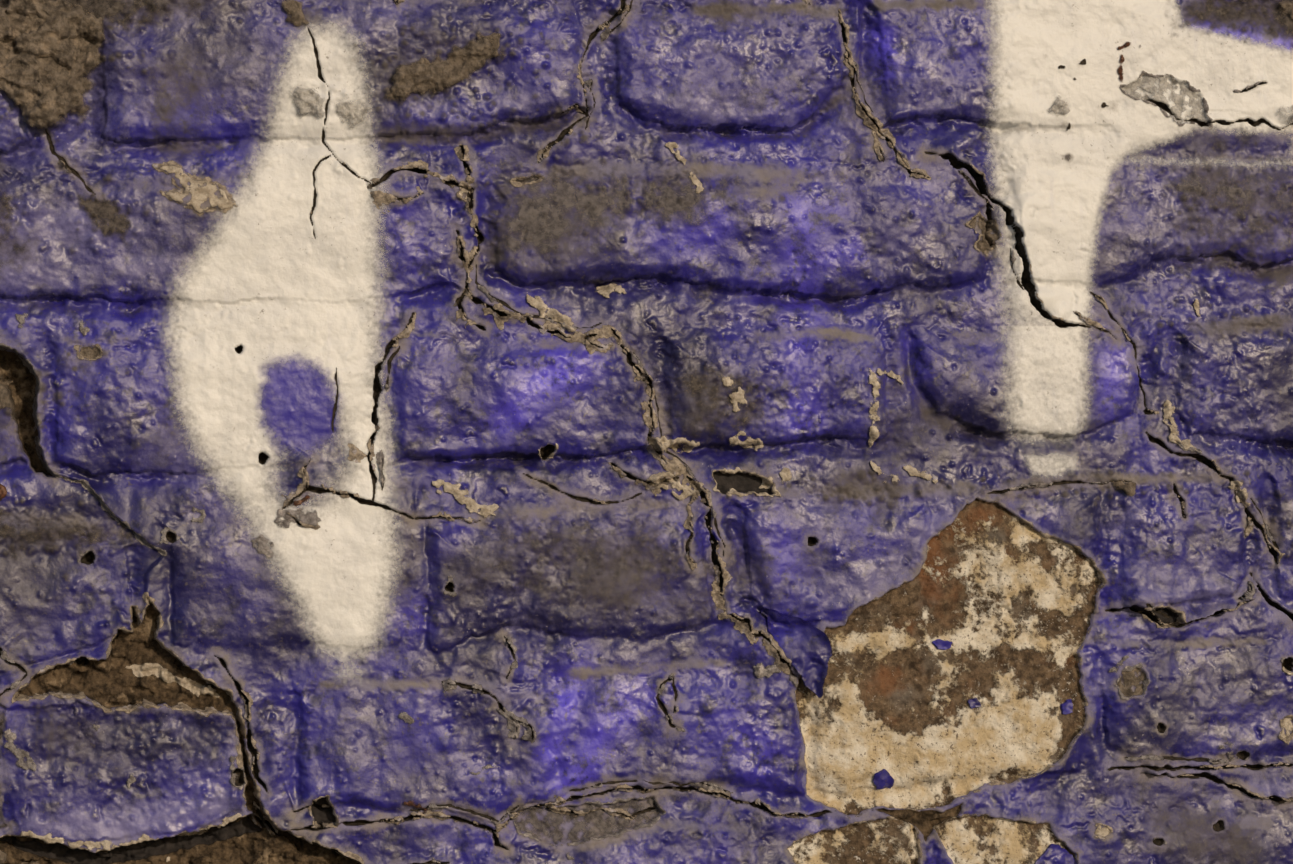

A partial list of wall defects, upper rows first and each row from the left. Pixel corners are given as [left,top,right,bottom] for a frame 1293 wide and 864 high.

crack [537,0,633,164]
spalling [1119,71,1213,129]
crack [281,28,798,678]
crack [803,0,1293,628]
spalling [0,592,360,864]
crack [441,636,537,743]
crack [214,655,832,864]
peeling [761,499,1106,864]
peeling [1095,823,1113,839]
crack [1108,755,1293,804]